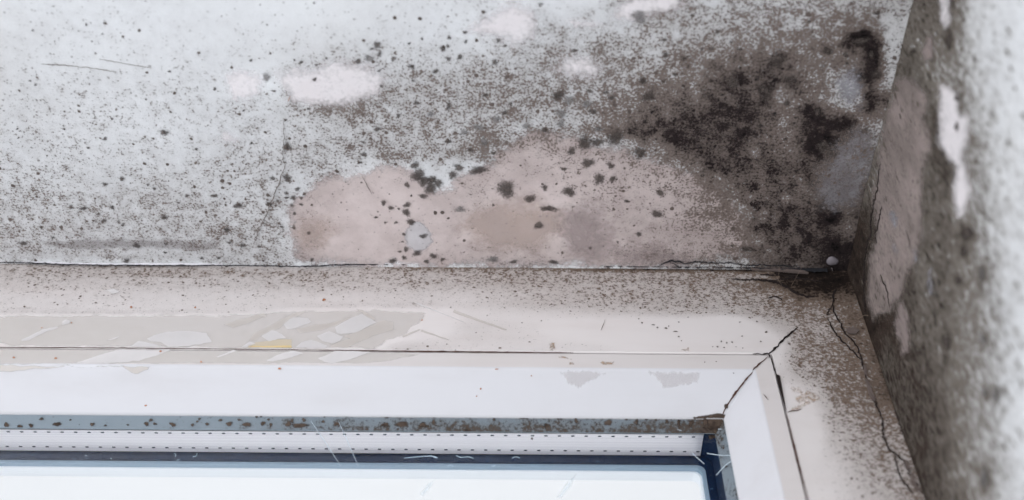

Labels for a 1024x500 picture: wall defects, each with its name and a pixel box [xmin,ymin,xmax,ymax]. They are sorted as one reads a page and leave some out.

leakage [55,83,139,131]
leakage [95,114,168,158]
crack [0,123,406,267]
leakage [374,193,415,225]
leakage [479,182,513,206]
leakage [525,195,557,211]
crack [604,166,926,500]